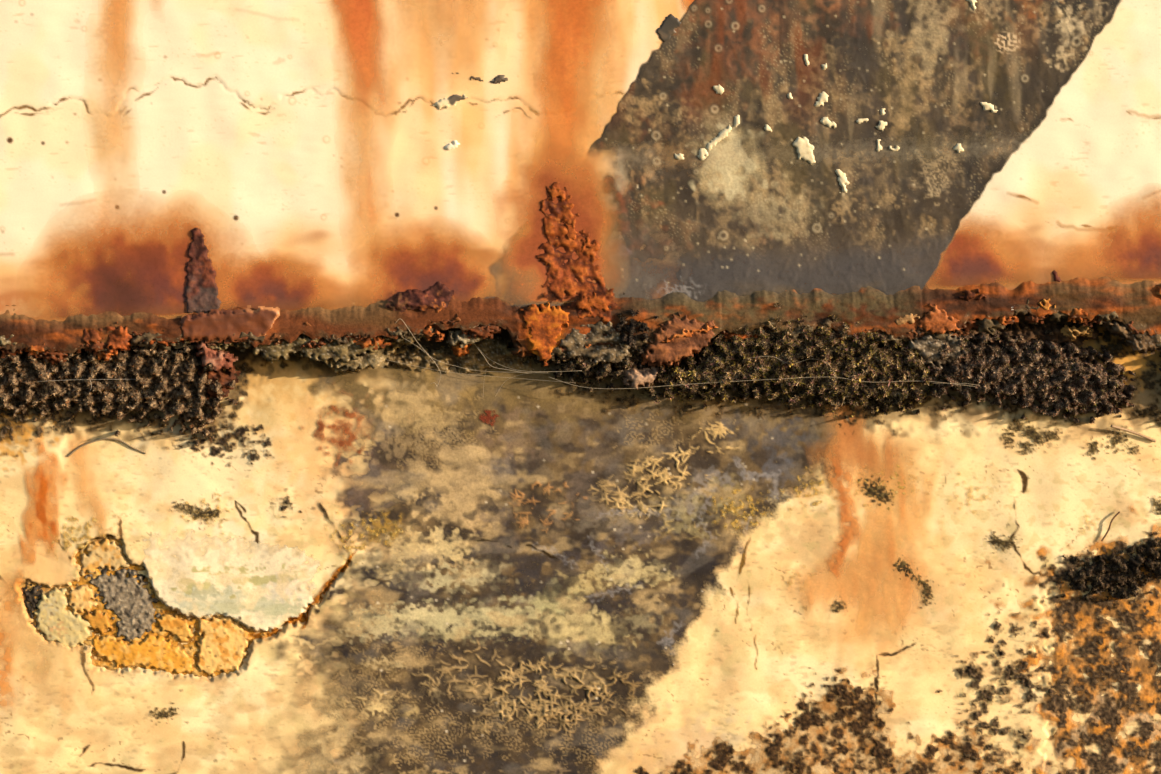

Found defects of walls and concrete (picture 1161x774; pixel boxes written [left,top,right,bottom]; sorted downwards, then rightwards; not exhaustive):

crack [0,98,89,117]
corrosion [0,0,1161,364]
corrosion [0,443,59,706]
spalling [19,530,327,678]
corrosion [805,402,921,635]